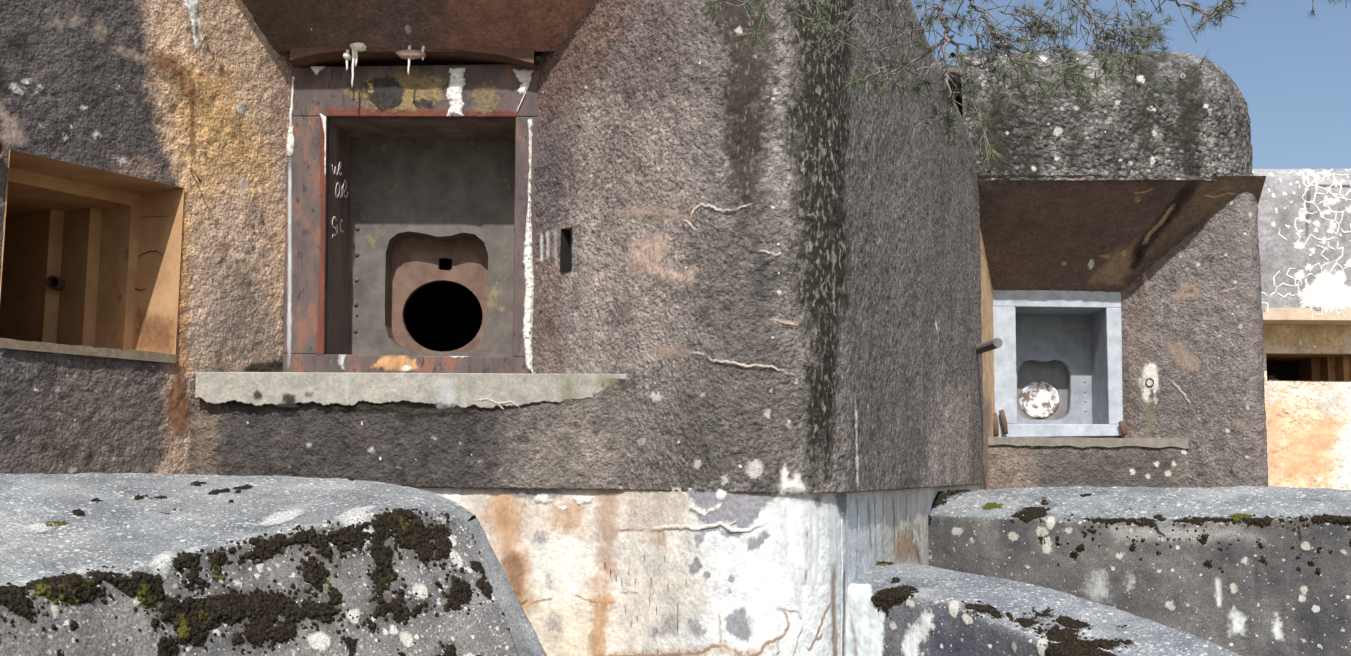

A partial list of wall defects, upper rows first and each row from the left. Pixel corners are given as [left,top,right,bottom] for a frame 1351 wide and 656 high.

peeling [345,66,446,111]
rust [317,108,517,355]
crack [1224,169,1351,317]
damp [701,0,908,656]
rust [371,355,418,372]
crack [692,352,789,374]
rust [168,378,190,434]
crack [1171,380,1190,403]
rust [486,498,531,608]
crack [619,521,765,534]
crack [603,604,830,656]
damp [901,610,934,656]